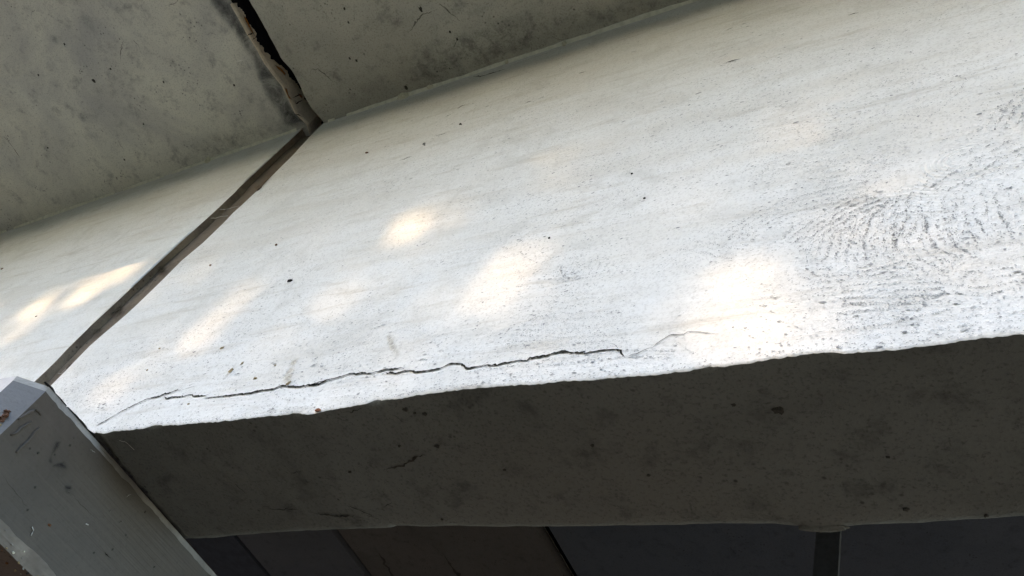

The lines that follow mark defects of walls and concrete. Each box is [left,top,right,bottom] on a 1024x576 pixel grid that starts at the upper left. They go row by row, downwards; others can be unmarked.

crack [98,331,706,425]